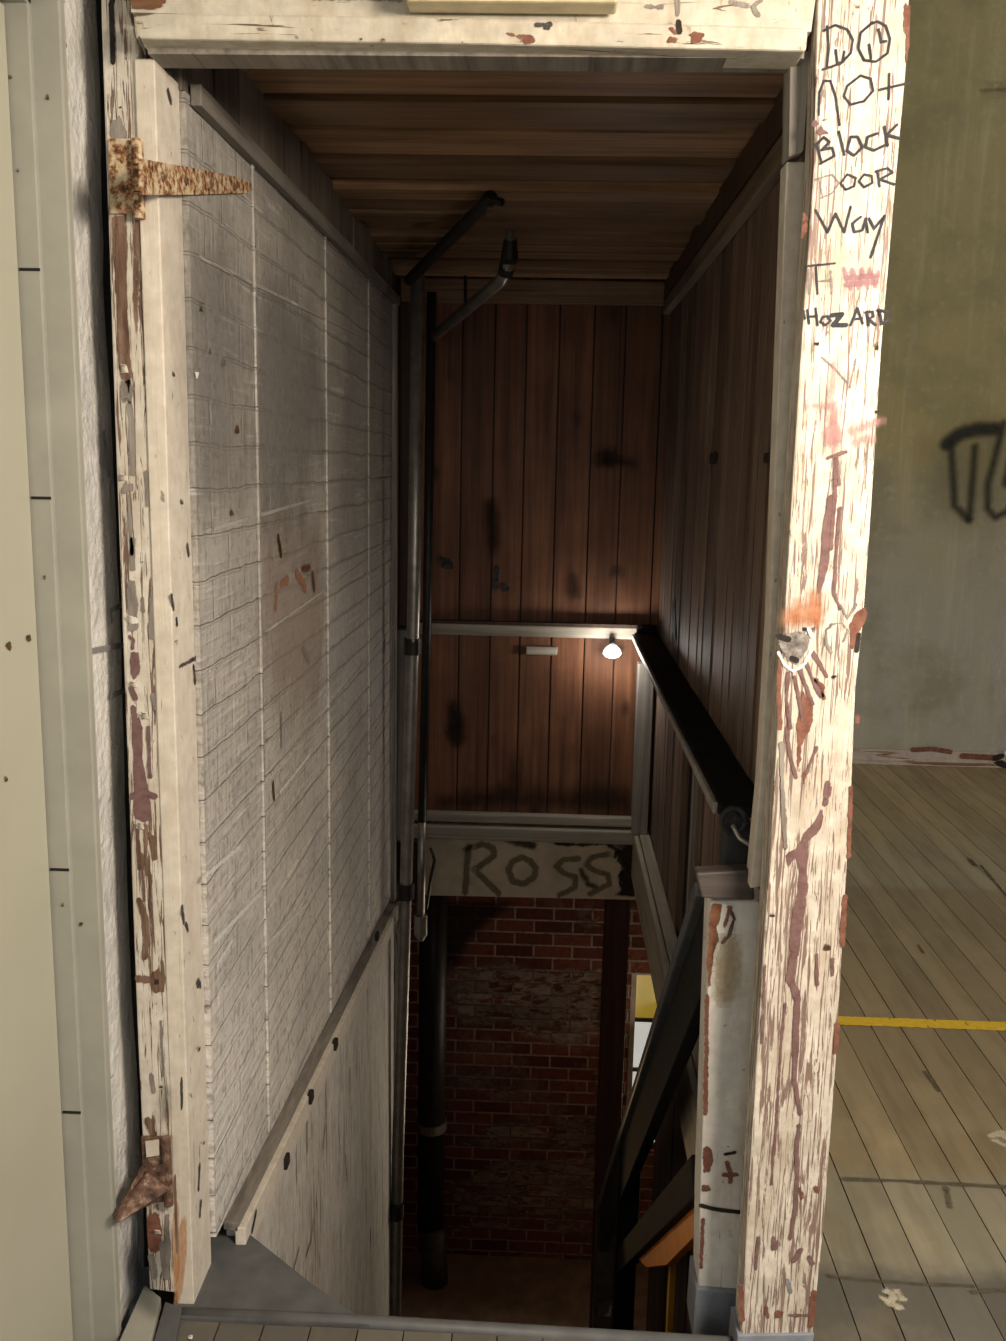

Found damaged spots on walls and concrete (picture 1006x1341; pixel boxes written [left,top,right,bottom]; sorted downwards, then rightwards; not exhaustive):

peeling [130,0,166,10]
peeling [817,450,867,653]
peeling [112,215,166,993]
peeling [840,894,848,948]
peeling [754,651,832,1270]
peeling [703,903,736,1116]
peeling [149,1020,165,1094]
peeling [145,1117,157,1136]
peeling [701,1146,739,1192]
peeling [146,1204,171,1280]
peeling [765,1290,817,1328]